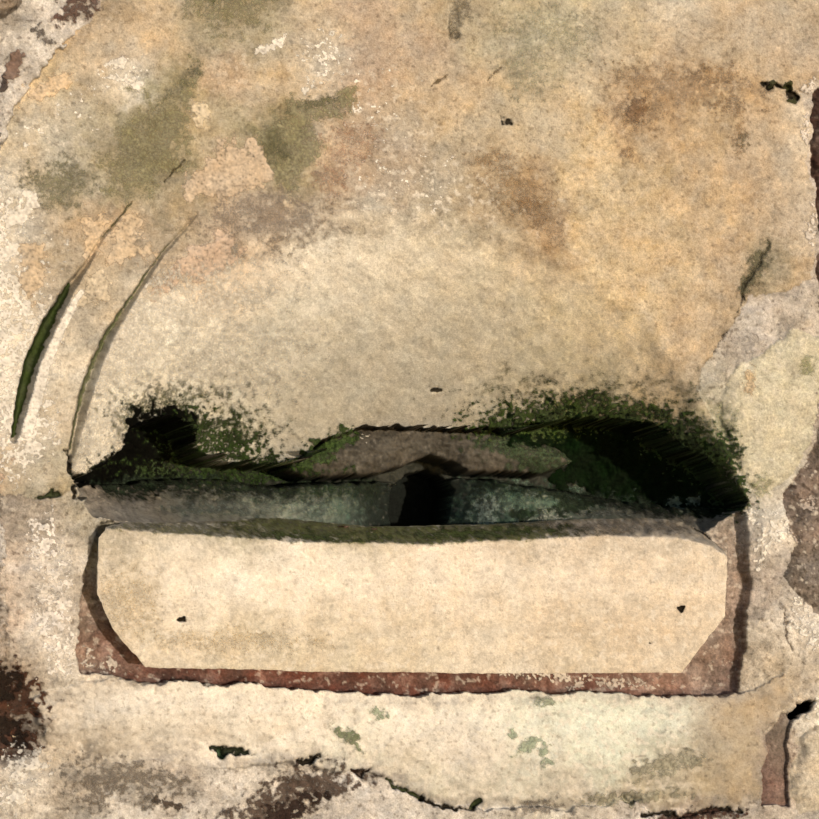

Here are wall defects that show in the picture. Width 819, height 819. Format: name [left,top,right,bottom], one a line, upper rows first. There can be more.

damp [69,381,379,504]
crack [35,449,84,499]
damp [250,475,712,543]
crack [296,753,321,766]
crack [350,769,483,812]